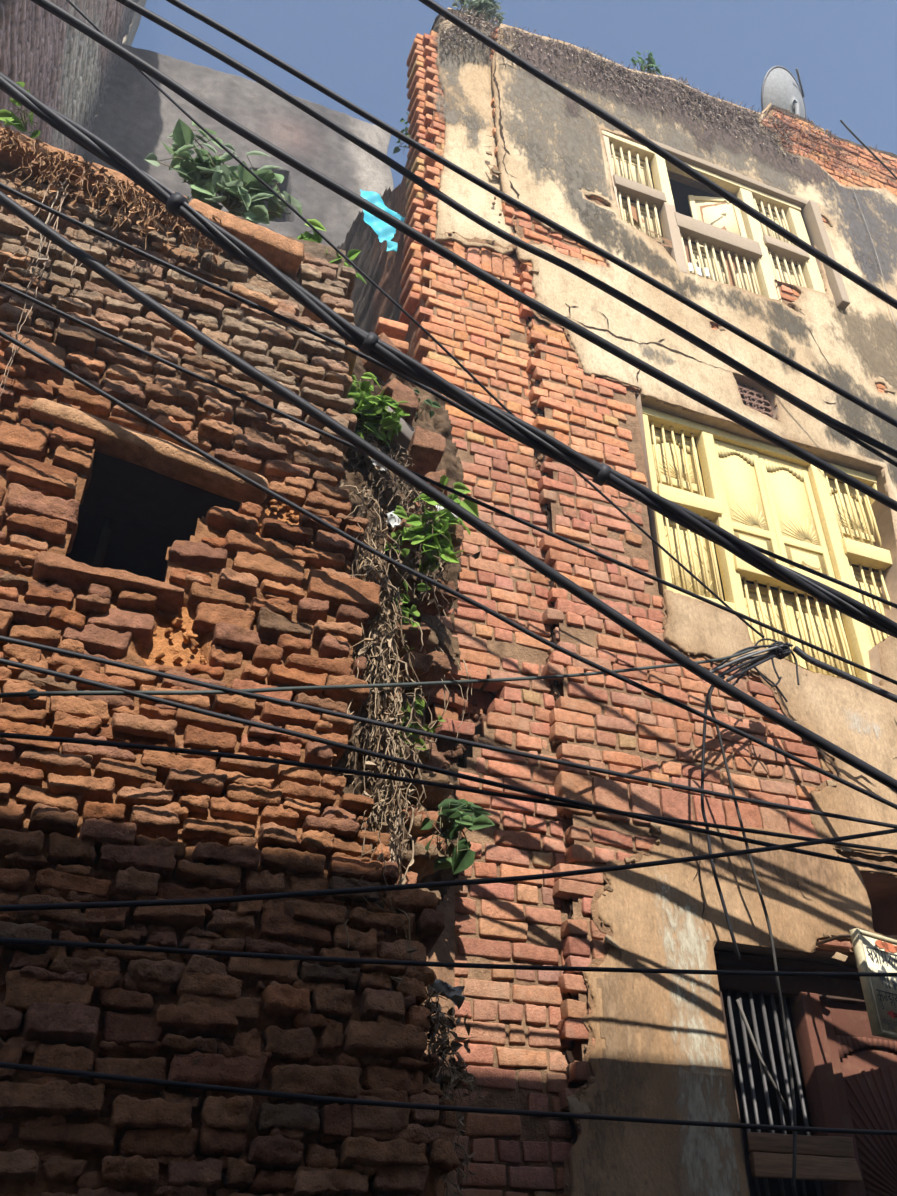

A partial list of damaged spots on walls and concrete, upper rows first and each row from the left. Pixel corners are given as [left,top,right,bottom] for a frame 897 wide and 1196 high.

crack [486,55,520,199]
spalling [440,196,608,267]
damp [436,23,897,369]
peeling [719,252,742,286]
spalling [761,108,897,196]
crack [527,317,552,536]
crack [565,303,727,382]
damp [813,302,897,484]
crack [546,581,561,708]
spalling [411,691,496,773]
crack [563,897,573,999]
spalling [566,822,662,1158]